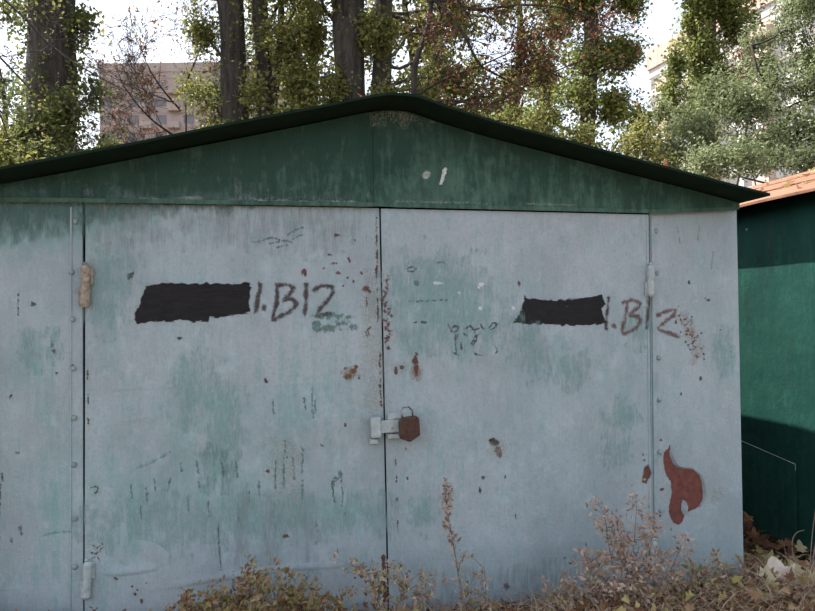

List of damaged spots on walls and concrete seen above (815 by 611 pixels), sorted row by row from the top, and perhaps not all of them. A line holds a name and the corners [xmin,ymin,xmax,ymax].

rust [375,217,393,406]
peeling [660,439,706,525]